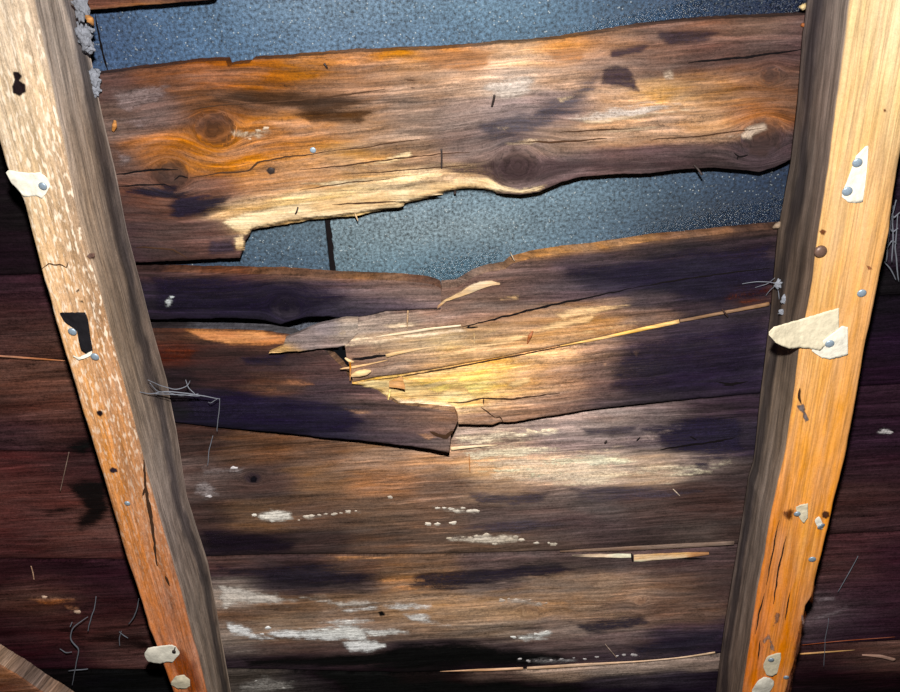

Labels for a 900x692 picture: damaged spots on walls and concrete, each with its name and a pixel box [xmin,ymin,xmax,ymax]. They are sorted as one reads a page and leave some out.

damp [482,46,667,142]
crack [116,139,470,205]
peeling [224,176,543,249]
crack [462,268,770,328]
peeling [346,323,464,346]
peeling [438,306,616,359]
peeling [358,376,482,406]
damp [252,510,357,522]
damp [446,521,557,546]
damp [219,586,282,609]
crack [755,522,790,657]
damp [228,601,599,668]